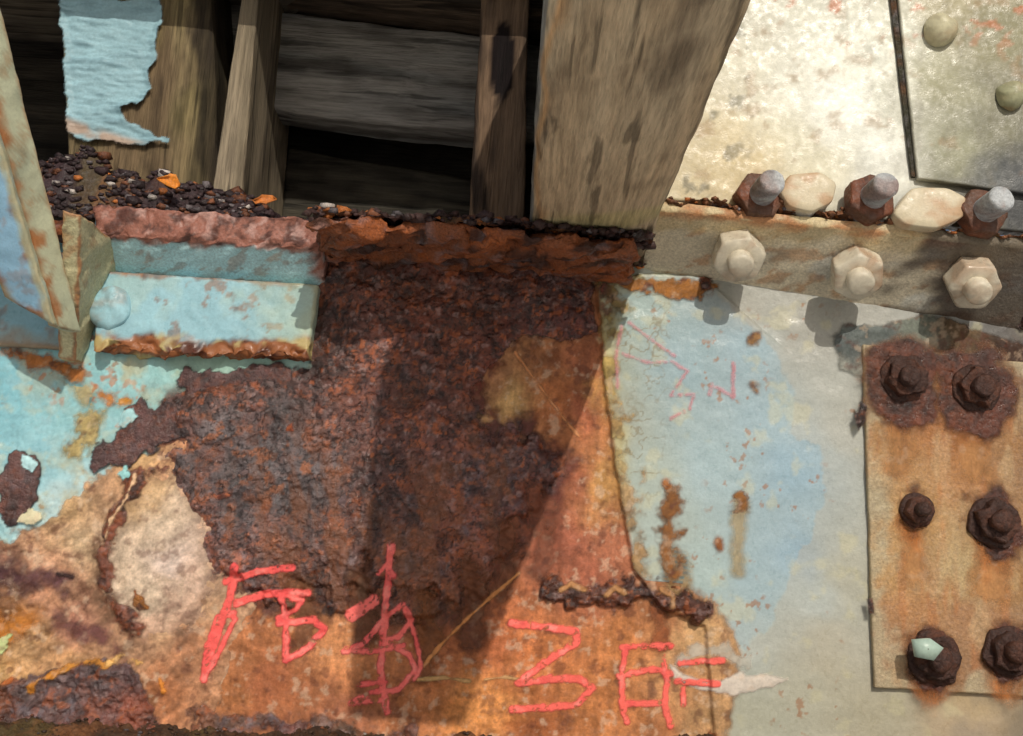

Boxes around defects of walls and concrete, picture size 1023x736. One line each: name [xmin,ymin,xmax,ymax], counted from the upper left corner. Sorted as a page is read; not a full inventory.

peeling [58,0,169,145]
peeling [89,397,190,479]
peeling [176,361,293,394]
corrosion [862,335,1019,480]
peeling [0,450,42,527]
corrosion [0,261,741,736]
corrosion [964,484,1011,504]
corrosion [974,525,1023,600]
peeling [0,634,12,654]
corrosion [906,667,948,702]
corrosion [983,661,1023,700]